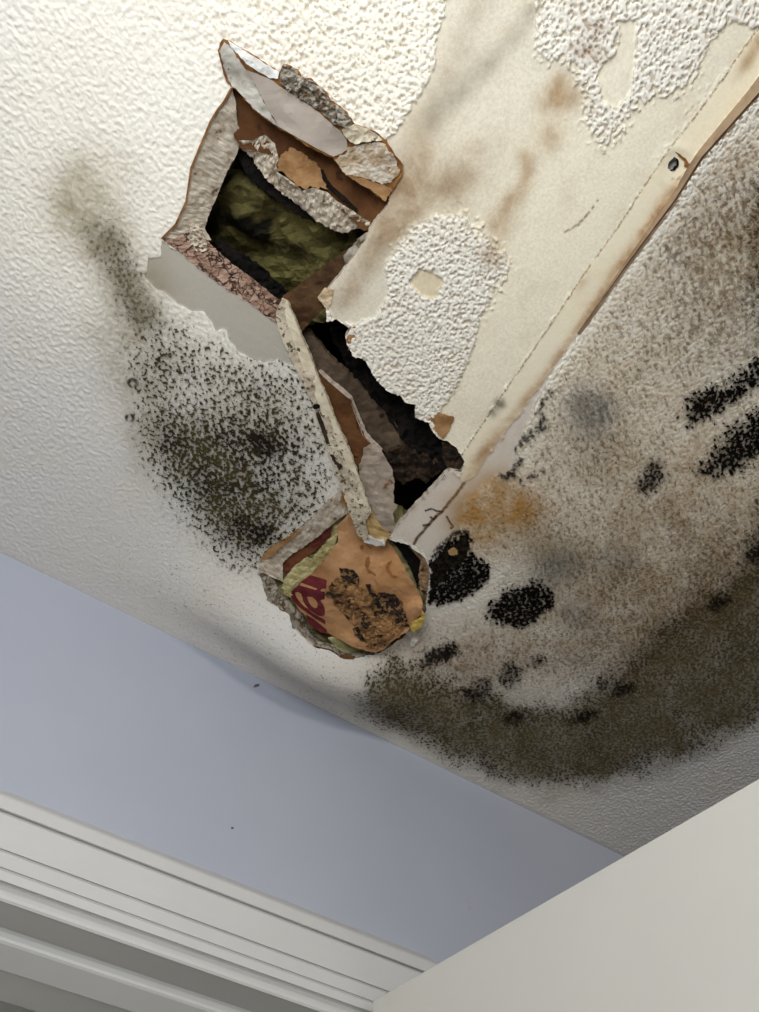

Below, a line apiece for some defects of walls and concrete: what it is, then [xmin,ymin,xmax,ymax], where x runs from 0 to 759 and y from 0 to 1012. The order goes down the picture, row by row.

damp [65,201,334,573]
peeling [145,241,293,365]
spalling [228,40,279,79]
peeling [239,0,759,455]
peeling [393,300,606,562]
damp [328,139,759,790]